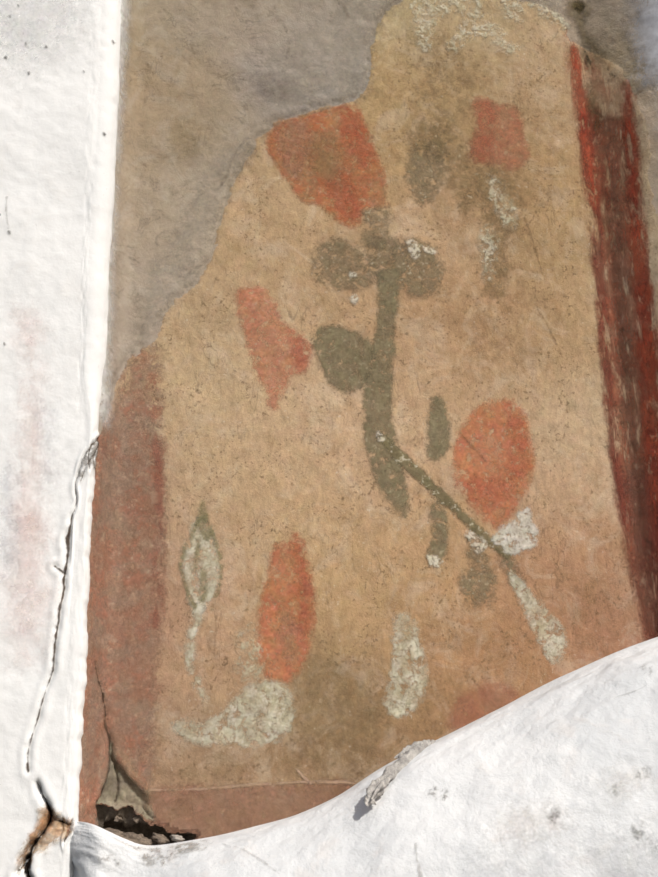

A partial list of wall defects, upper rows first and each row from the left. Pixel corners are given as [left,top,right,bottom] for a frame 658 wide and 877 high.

peeling [410,0,515,52]
peeling [406,239,436,258]
crack [20,439,99,877]
crack [95,667,118,803]
flaking render [79,743,154,820]